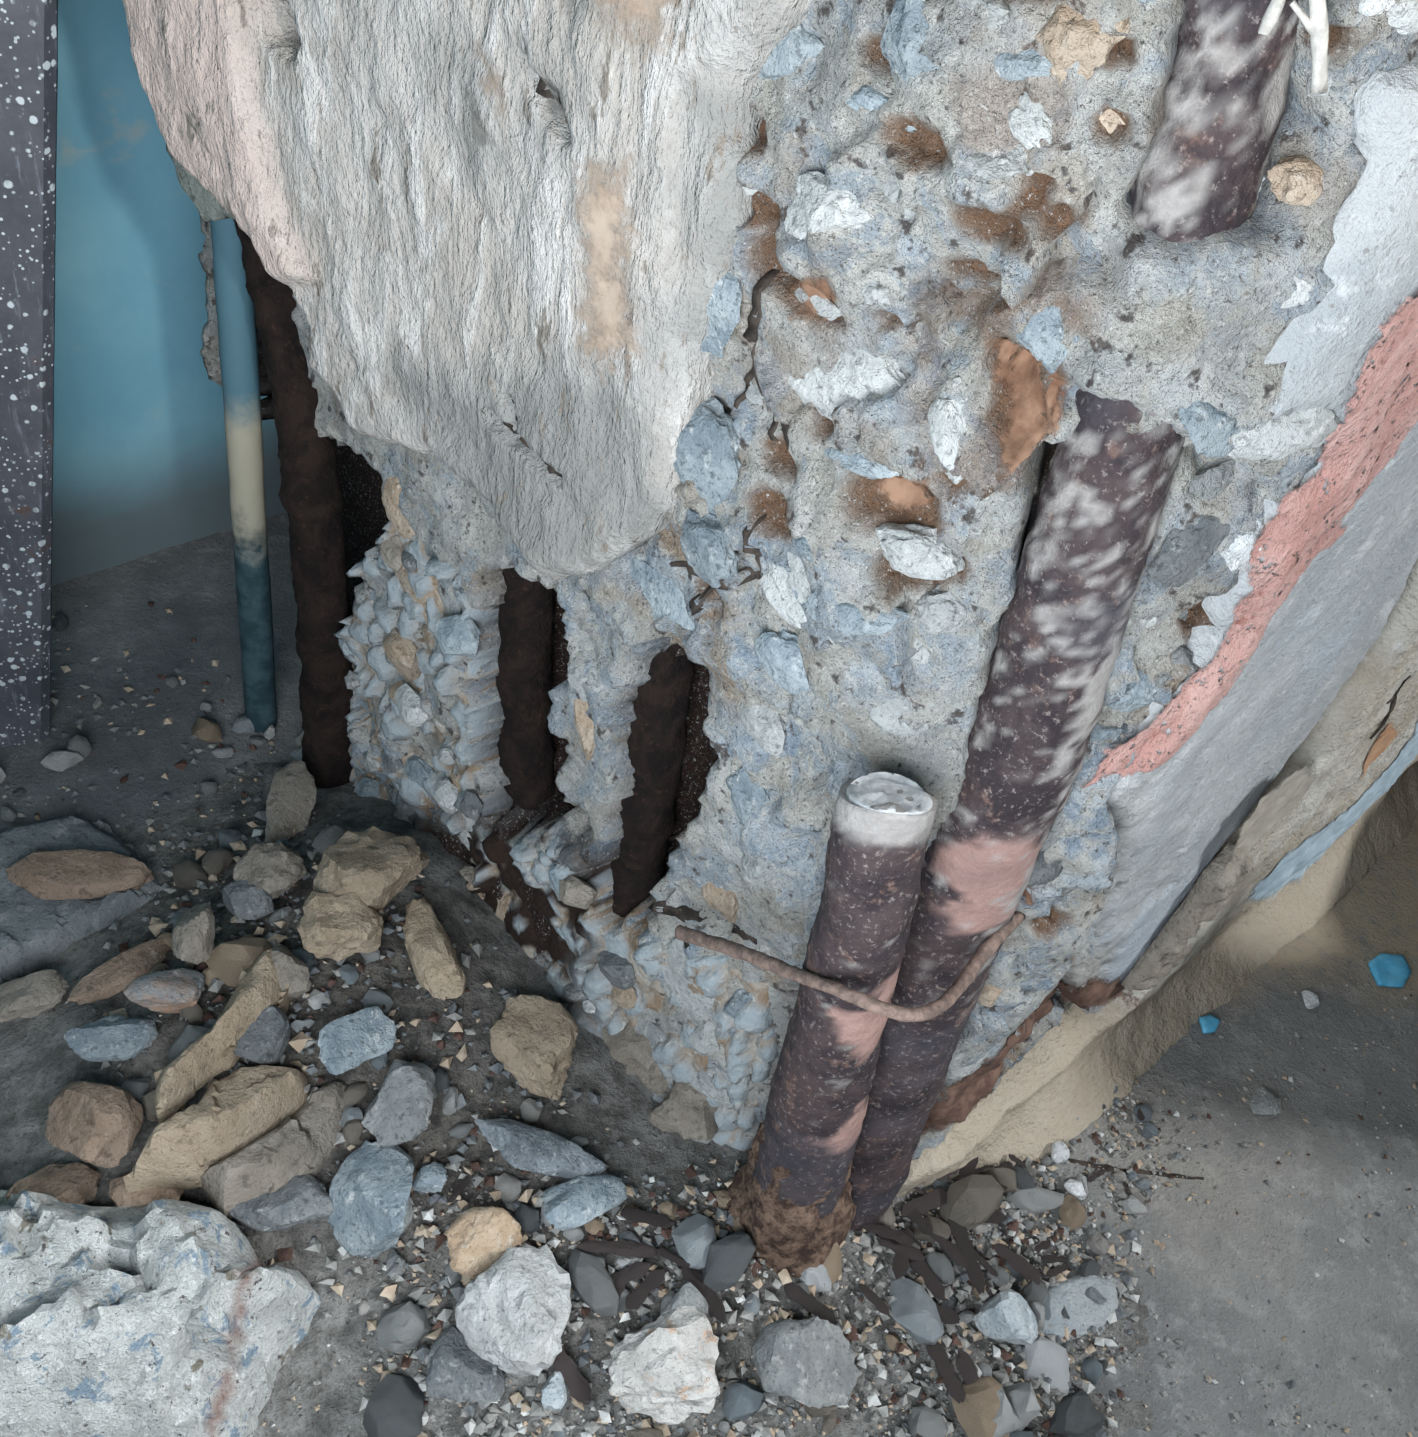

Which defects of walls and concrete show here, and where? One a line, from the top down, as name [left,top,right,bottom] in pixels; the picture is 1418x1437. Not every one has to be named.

crack [536,75,567,123]
crack [502,400,563,477]
corrosion [879,476,933,510]
spalling [385,669,460,738]
peeling [1249,722,1418,902]
spalling [492,874,566,968]
flaking render [1079,1003,1104,1014]
corrosion [921,975,1141,1135]